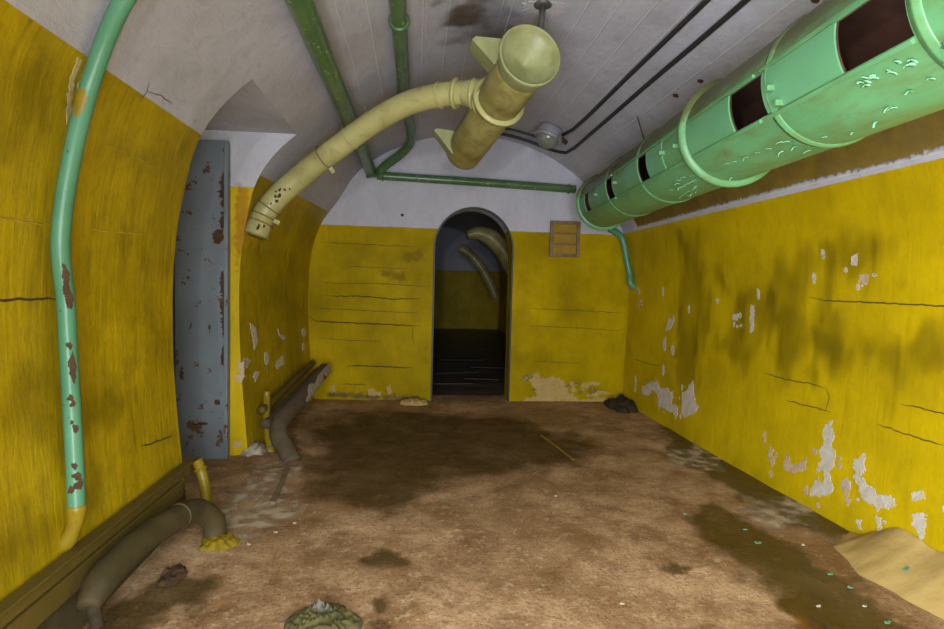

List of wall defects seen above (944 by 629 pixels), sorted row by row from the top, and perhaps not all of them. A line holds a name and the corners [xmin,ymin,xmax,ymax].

peeling [66,57,83,124]
crack [0,295,56,303]
corrosion [208,271,224,367]
peeling [234,323,284,383]
peeling [663,315,675,356]
peeling [732,289,760,334]
peeling [521,372,610,402]
peeling [634,365,699,419]
water stain [316,412,588,507]
peeling [763,420,896,531]
peeling [911,490,927,540]